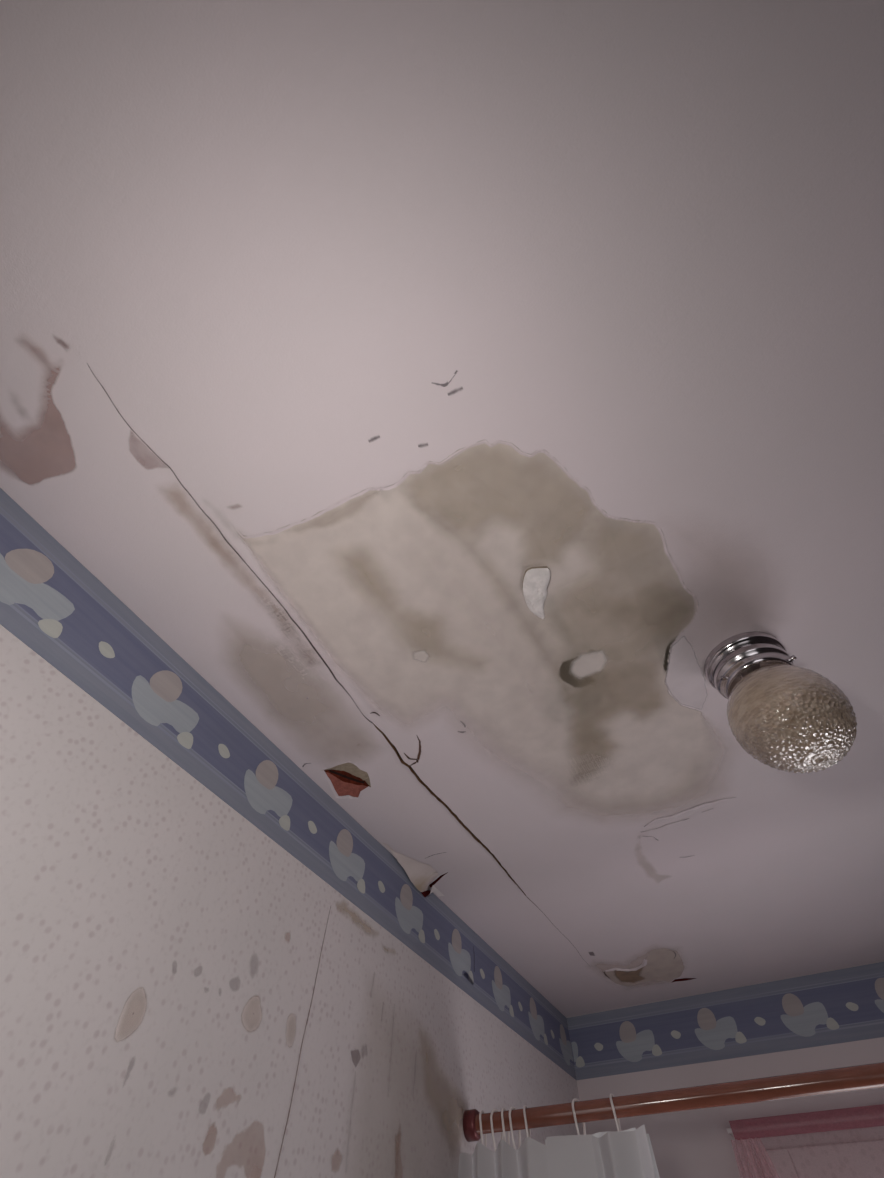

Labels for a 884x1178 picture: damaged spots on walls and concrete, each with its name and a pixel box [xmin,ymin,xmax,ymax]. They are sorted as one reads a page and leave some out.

crack [88,365,552,923]
peeling [227,440,717,811]
peeling [604,948,696,986]